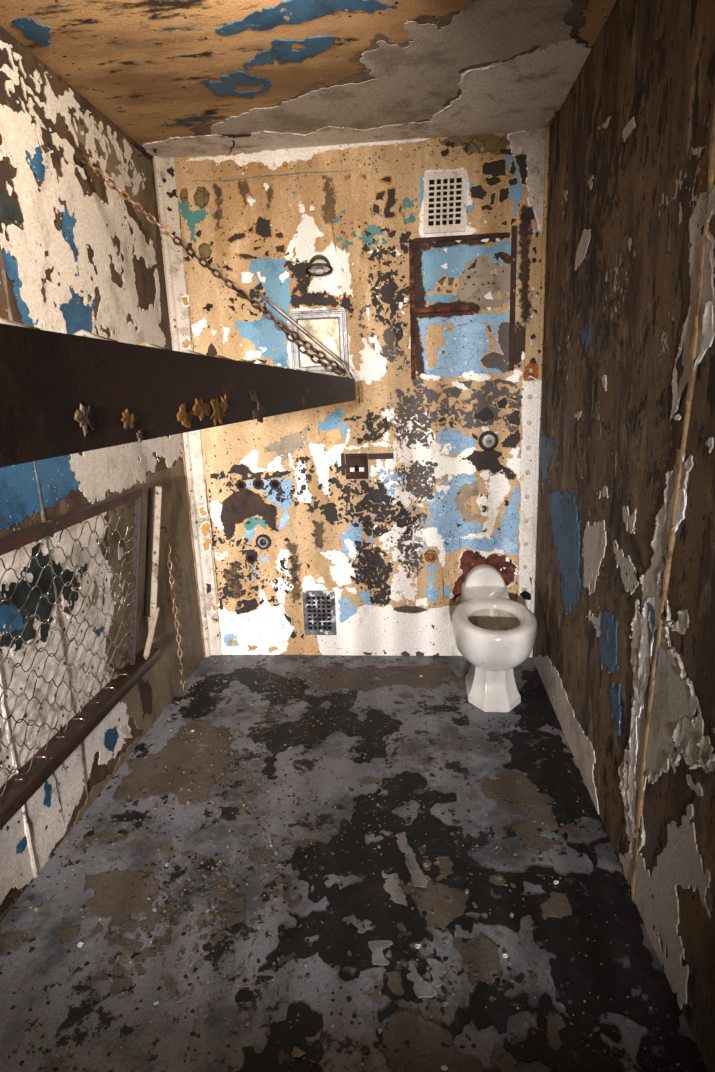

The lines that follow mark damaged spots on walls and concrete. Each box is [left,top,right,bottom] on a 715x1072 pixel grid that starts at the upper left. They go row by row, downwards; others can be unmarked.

peeling [0,0,592,656]
rust [409,237,503,376]
spalling [258,31,715,1072]
peeling [80,869,261,1003]
spalling [236,1002,324,1072]